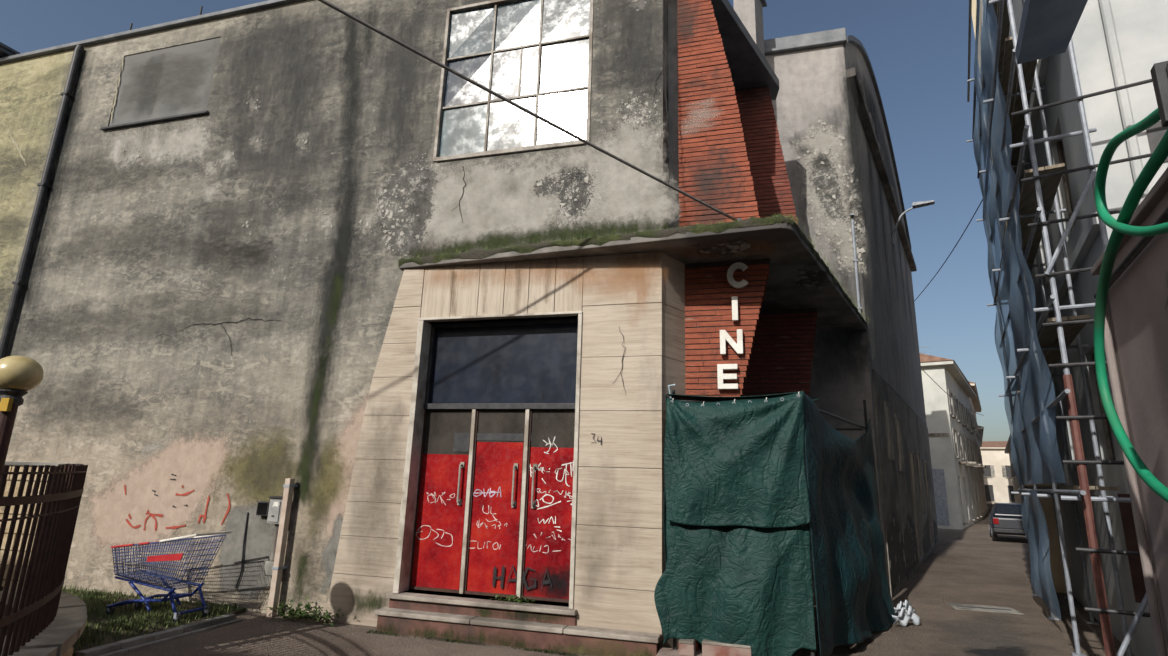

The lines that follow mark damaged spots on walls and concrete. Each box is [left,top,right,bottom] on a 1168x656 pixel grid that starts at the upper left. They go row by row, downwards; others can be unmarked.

leakage [52,55,157,197]
leakage [296,17,372,502]
spalling [533,158,609,229]
crack [178,317,281,354]